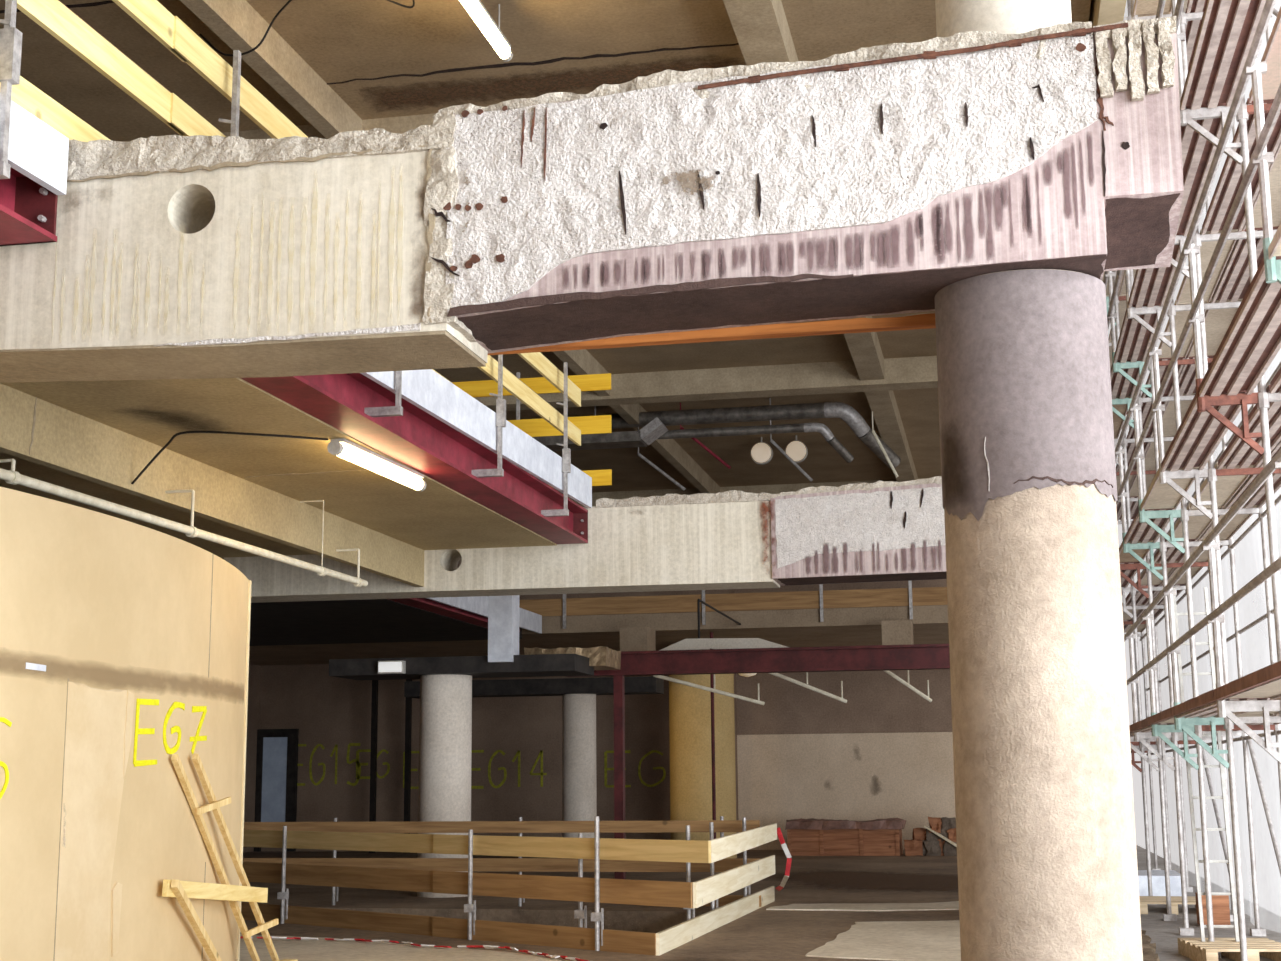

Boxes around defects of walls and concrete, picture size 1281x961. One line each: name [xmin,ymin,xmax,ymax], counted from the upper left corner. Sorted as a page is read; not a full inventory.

crack [327,43,739,85]
spalling [156,22,1098,346]
rust [443,202,484,211]
spalling [1104,193,1180,270]
rust [450,254,480,271]
spalling [775,476,945,569]
damp [0,660,244,700]